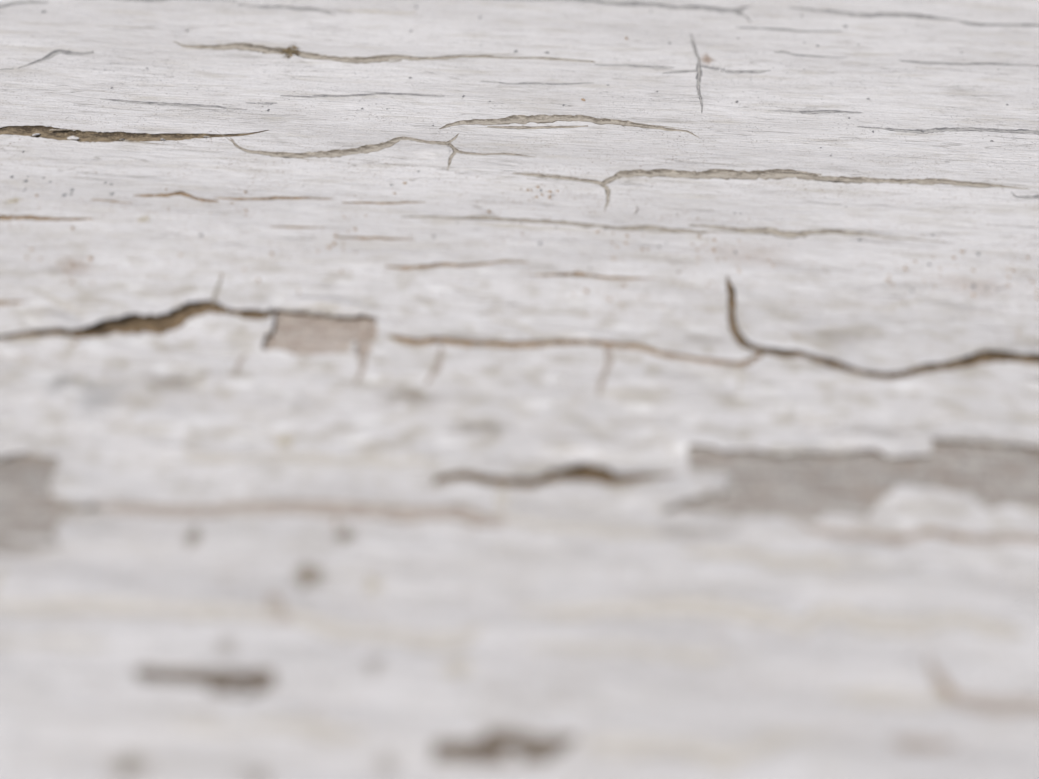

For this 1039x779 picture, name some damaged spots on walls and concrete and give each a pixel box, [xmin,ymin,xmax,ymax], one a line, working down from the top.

crack [0,0,1039,242]
crack [0,273,274,340]
peeling [261,309,378,356]
crack [354,353,367,386]
crack [385,258,657,280]
crack [387,276,1039,396]
peeling [0,452,101,555]
peeling [664,438,1039,523]